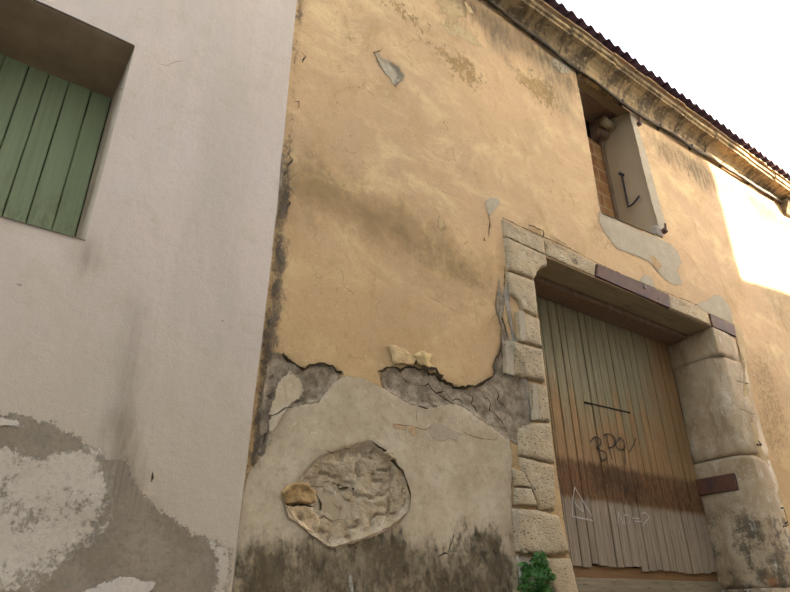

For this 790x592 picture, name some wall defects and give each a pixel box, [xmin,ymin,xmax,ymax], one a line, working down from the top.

spalling [373,49,405,88]
peeling [379,0,494,94]
peeling [510,65,563,110]
peeling [255,352,344,456]
peeling [381,280,532,444]
peeling [0,412,233,592]
spalling [281,440,411,548]
damp [235,525,514,592]